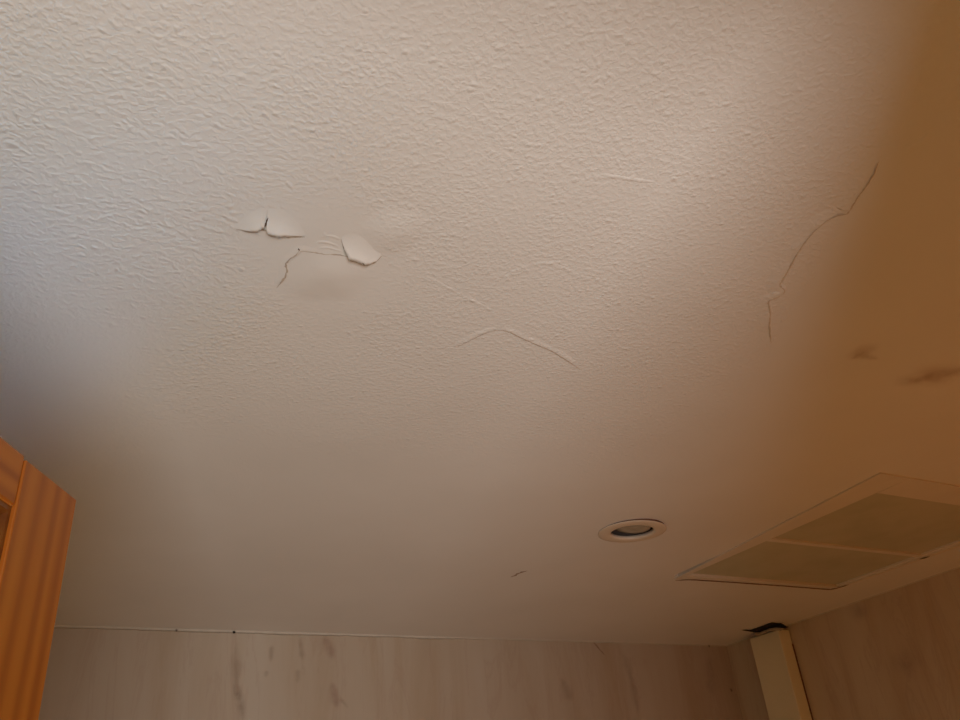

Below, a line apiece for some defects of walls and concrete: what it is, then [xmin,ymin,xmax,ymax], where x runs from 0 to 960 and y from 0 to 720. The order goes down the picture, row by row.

peeling [235,208,305,238]
peeling [341,234,382,266]
crack [275,246,347,287]